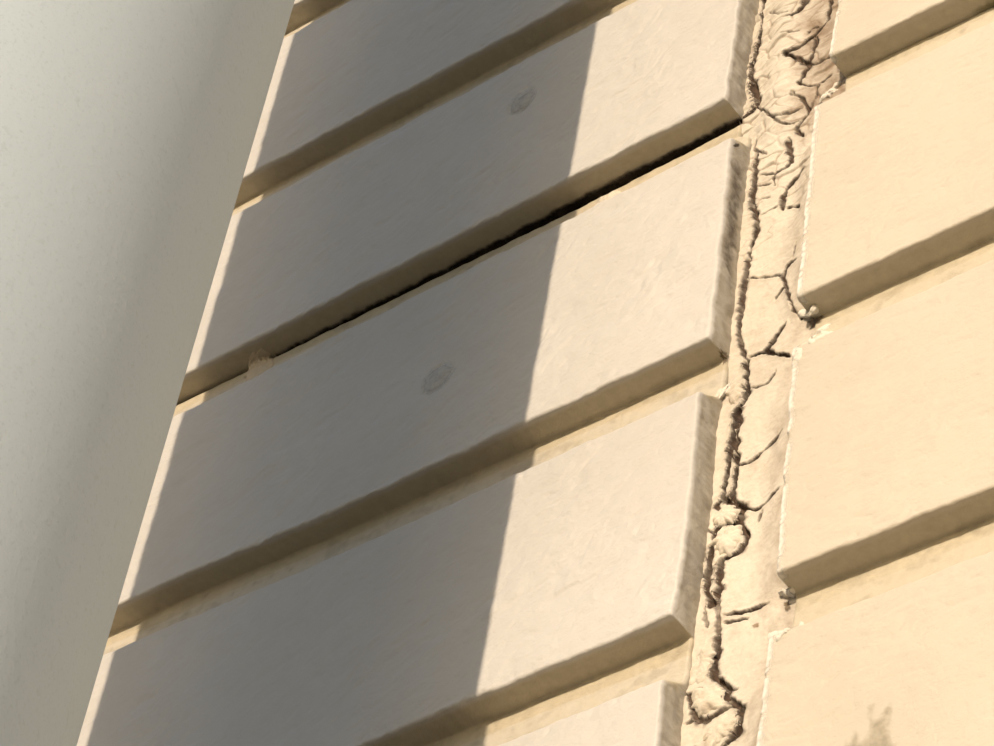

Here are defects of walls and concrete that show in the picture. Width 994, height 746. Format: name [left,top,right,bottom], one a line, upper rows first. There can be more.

crack [276,0,834,746]